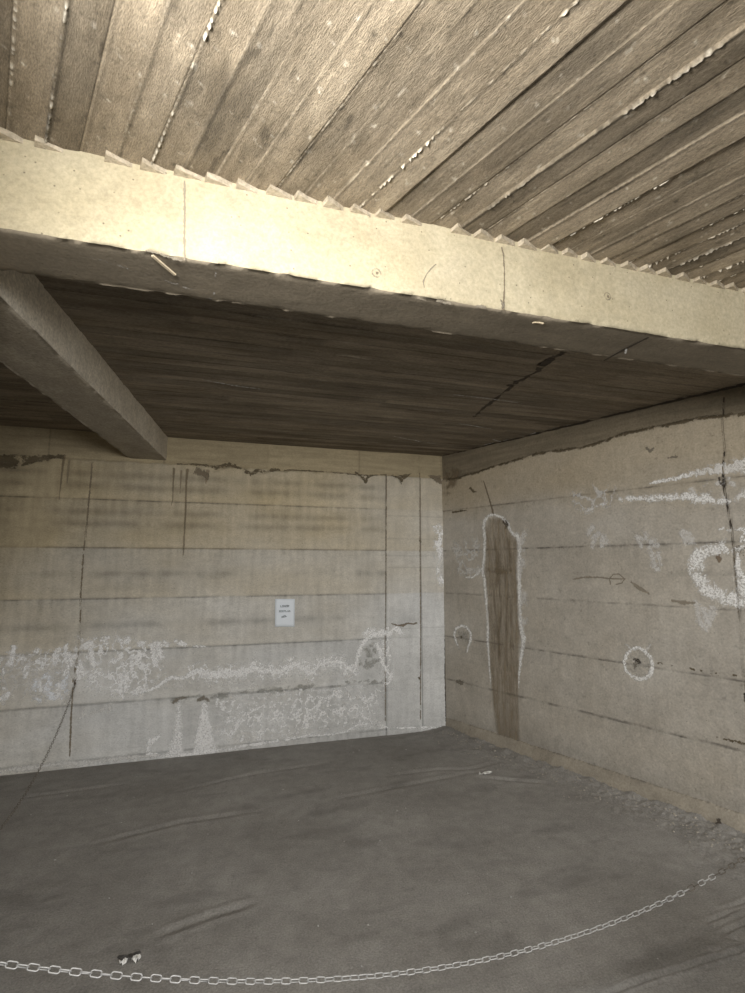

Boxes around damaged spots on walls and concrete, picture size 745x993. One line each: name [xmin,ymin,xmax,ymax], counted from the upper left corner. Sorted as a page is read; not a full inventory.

crack [472,352,566,417]
crack [604,337,649,361]
damp [0,454,68,496]
damp [572,458,745,514]
crack [718,397,740,621]
damp [433,513,527,740]
damp [680,527,745,631]
damp [0,626,441,771]